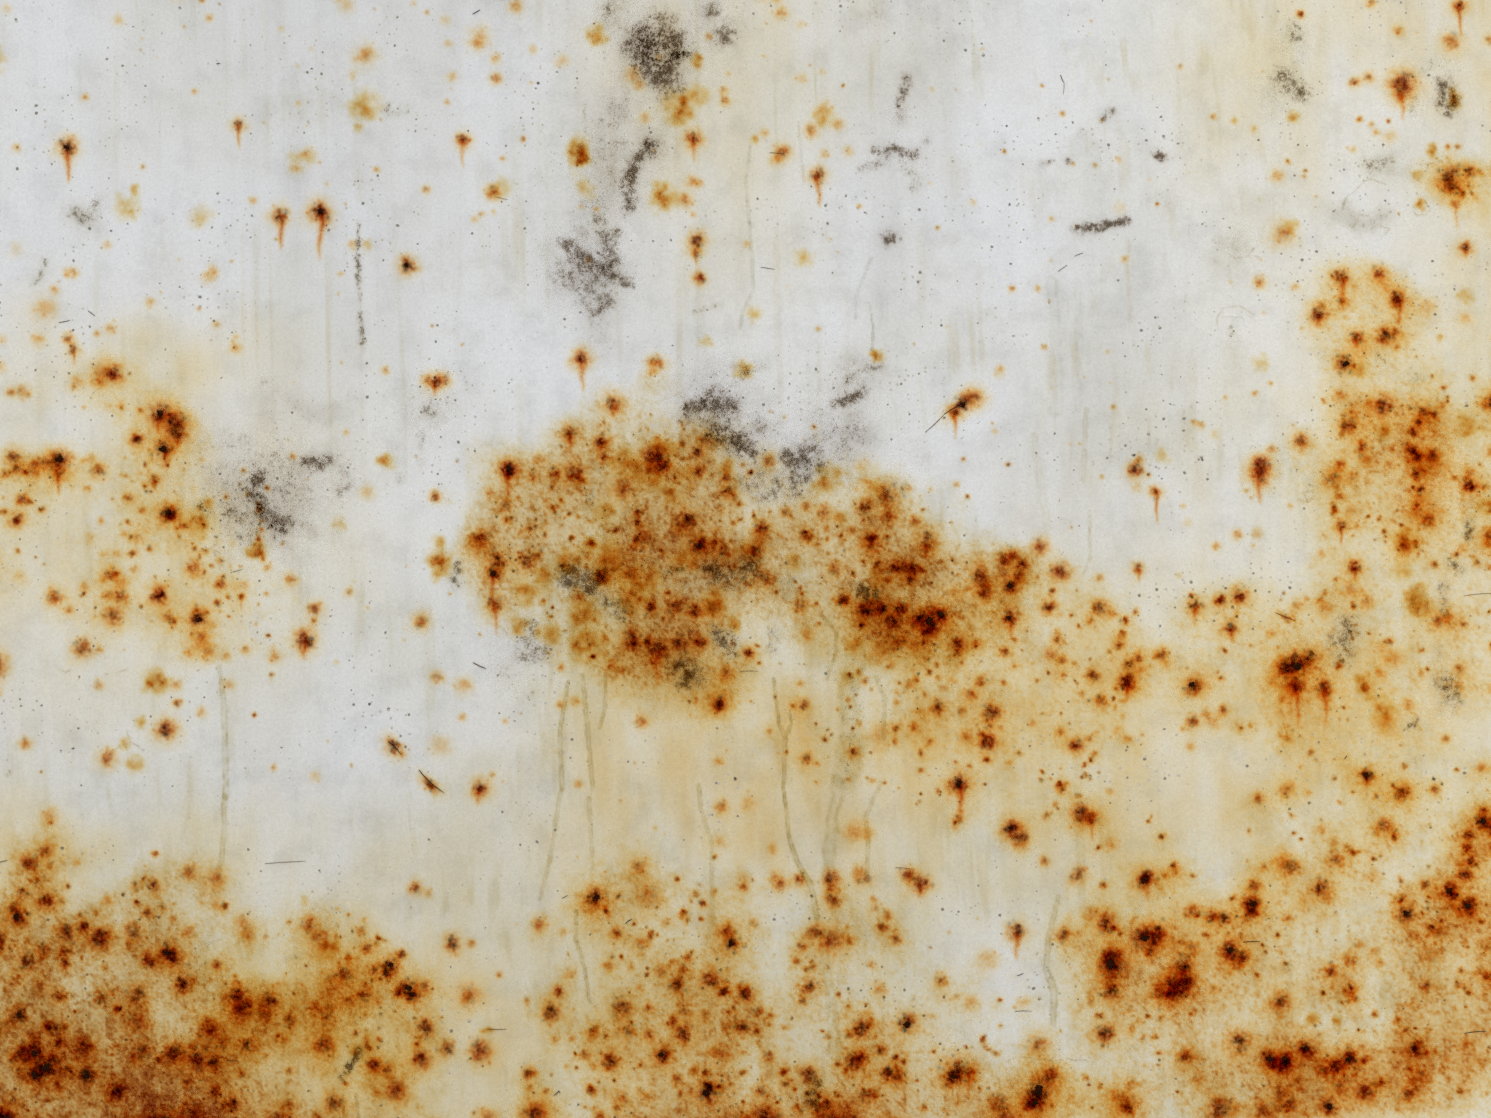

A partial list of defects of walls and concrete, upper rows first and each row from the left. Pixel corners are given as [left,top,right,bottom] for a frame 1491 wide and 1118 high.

water stain [621,13,692,115]
water stain [569,144,589,164]
water stain [622,138,659,211]
water stain [559,215,635,316]
corrosion [576,442,812,675]
corrosion [822,489,955,651]
corrosion [0,847,295,1118]
corrosion [1098,915,1199,1018]
corrosion [1190,880,1260,976]
corrosion [1399,808,1491,960]
corrosion [615,951,918,1118]
corrosion [1255,1018,1490,1117]